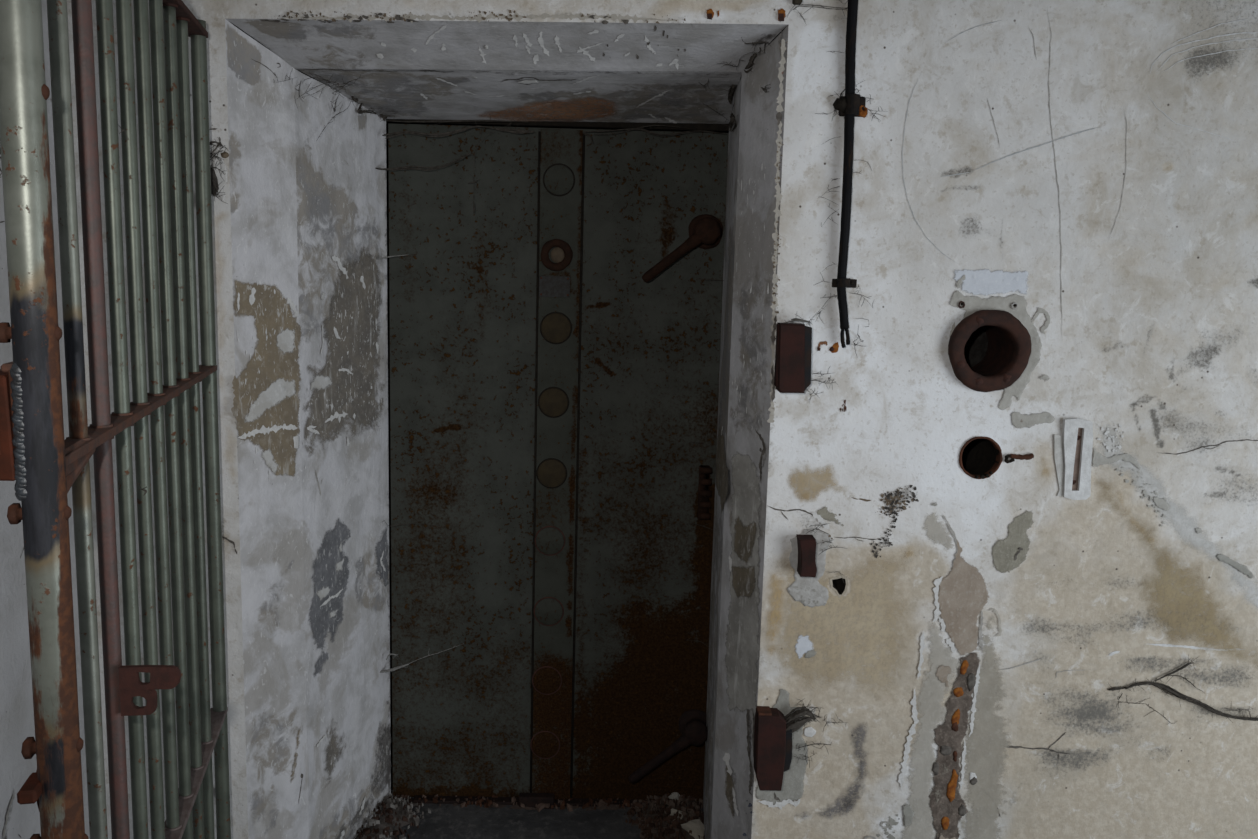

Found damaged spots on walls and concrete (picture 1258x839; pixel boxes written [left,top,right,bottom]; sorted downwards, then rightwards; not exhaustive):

corrosion [481,98,614,121]
peeling [231,247,383,476]
peeling [716,29,817,816]
peeling [309,519,351,675]
damp [769,485,919,685]
spalling [864,503,1034,839]
corrosion [929,653,980,839]
damp [1150,553,1239,652]